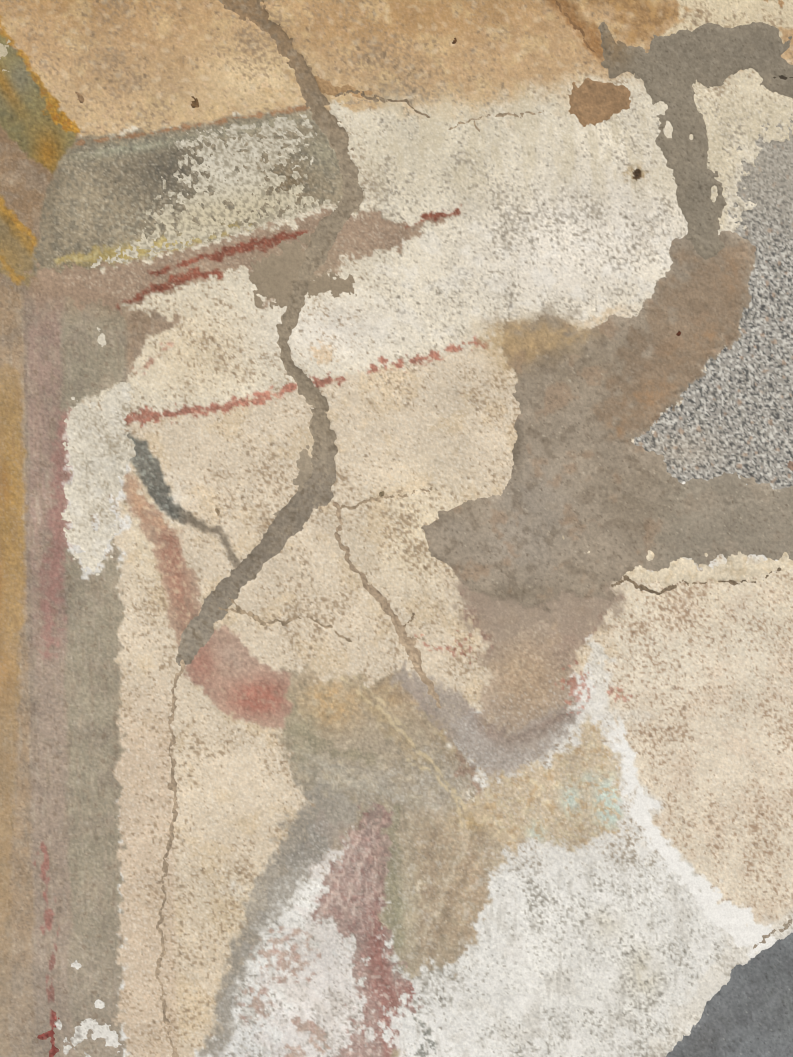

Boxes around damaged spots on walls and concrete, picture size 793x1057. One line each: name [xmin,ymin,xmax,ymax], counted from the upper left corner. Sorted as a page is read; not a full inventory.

damp [574,0,703,50]
spalling [634,114,793,490]
crack [155,0,544,1057]
crack [611,567,782,595]